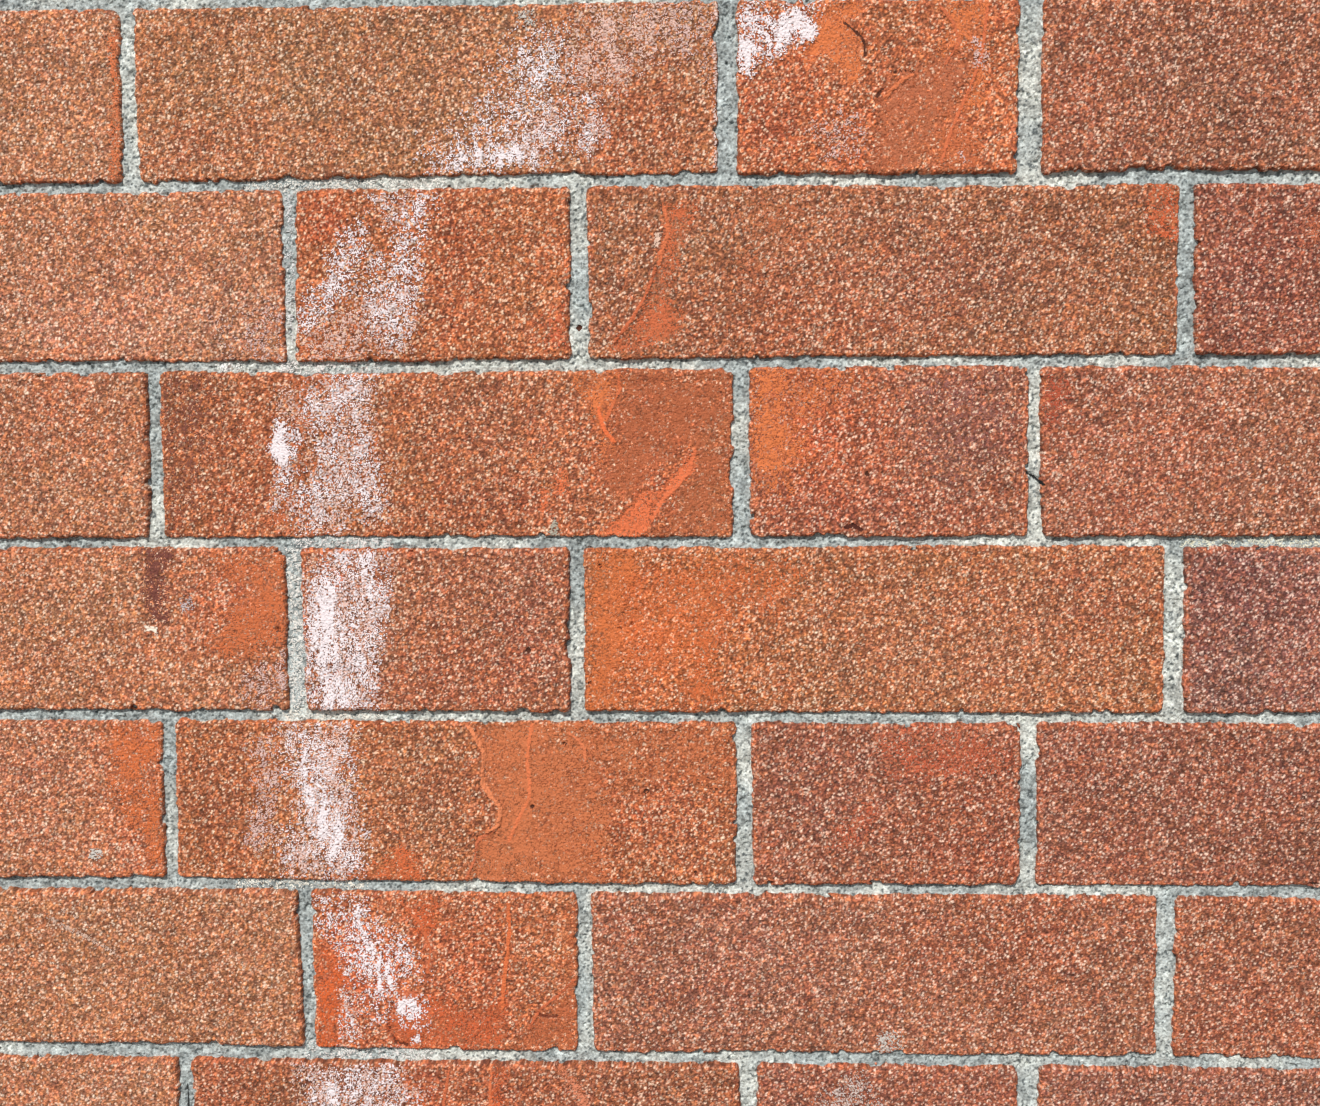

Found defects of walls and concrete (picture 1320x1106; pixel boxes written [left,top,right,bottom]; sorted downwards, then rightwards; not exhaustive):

efflorescence [648,1,719,170]
efflorescence [736,0,826,79]
leakage [137,19,611,1106]